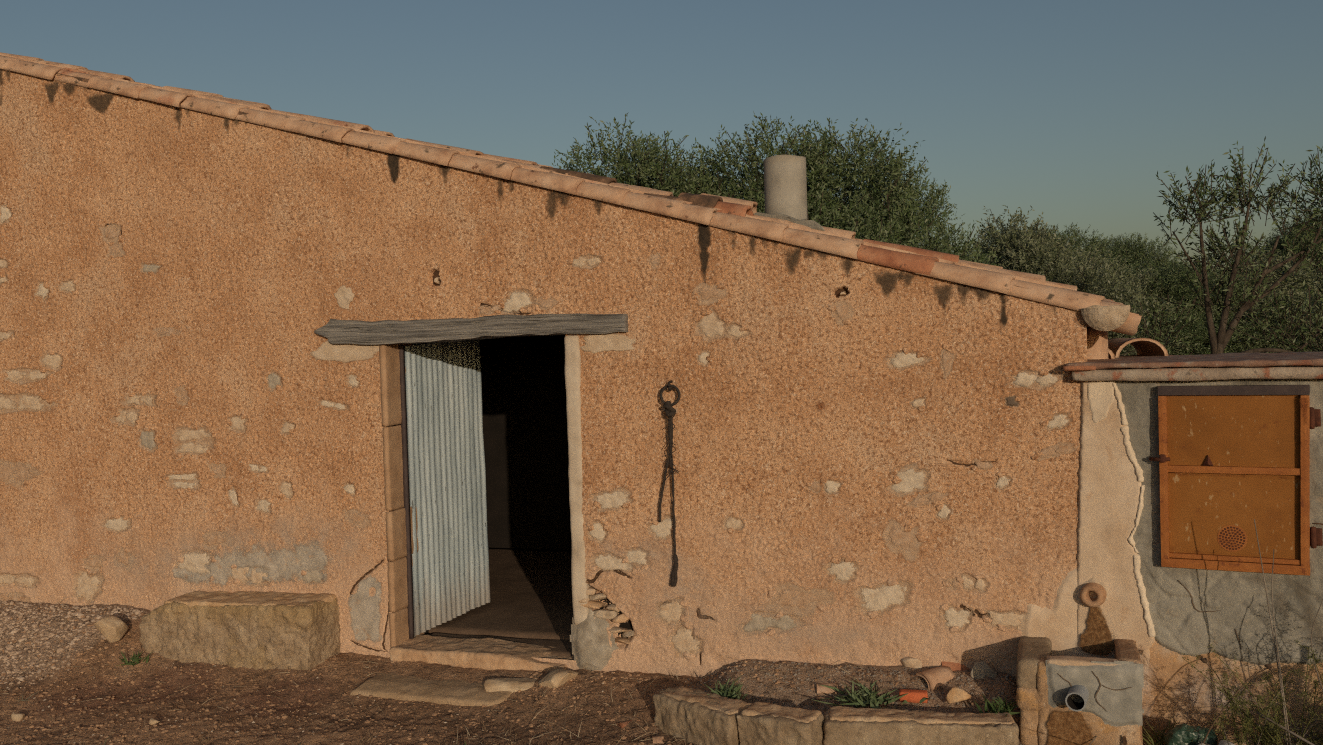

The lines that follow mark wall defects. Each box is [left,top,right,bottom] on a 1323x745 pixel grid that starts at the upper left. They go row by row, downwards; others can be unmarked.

damp [45,83,75,103]
damp [88,93,113,112]
damp [698,224,711,275]
damp [787,248,826,272]
damp [875,273,913,294]
damp [935,284,1008,325]
flaking render [0,350,63,414]
flaking render [886,463,930,497]
flaking render [174,549,269,587]
flaking render [578,487,679,644]
flaking render [823,556,914,619]
damp [1080,607,1115,655]